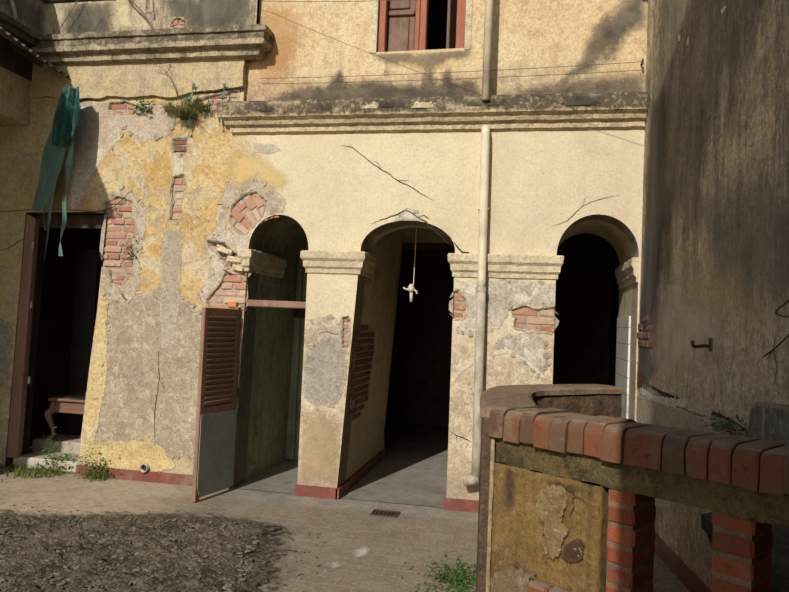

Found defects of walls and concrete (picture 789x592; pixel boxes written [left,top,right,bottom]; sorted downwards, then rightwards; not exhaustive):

peeling [68,99,188,210]
crack [343,144,469,253]
damp [637,90,710,390]
flaking render [80,142,287,474]
flaking render [305,314,374,421]
flaking render [449,278,559,378]
flaking render [535,484,585,563]